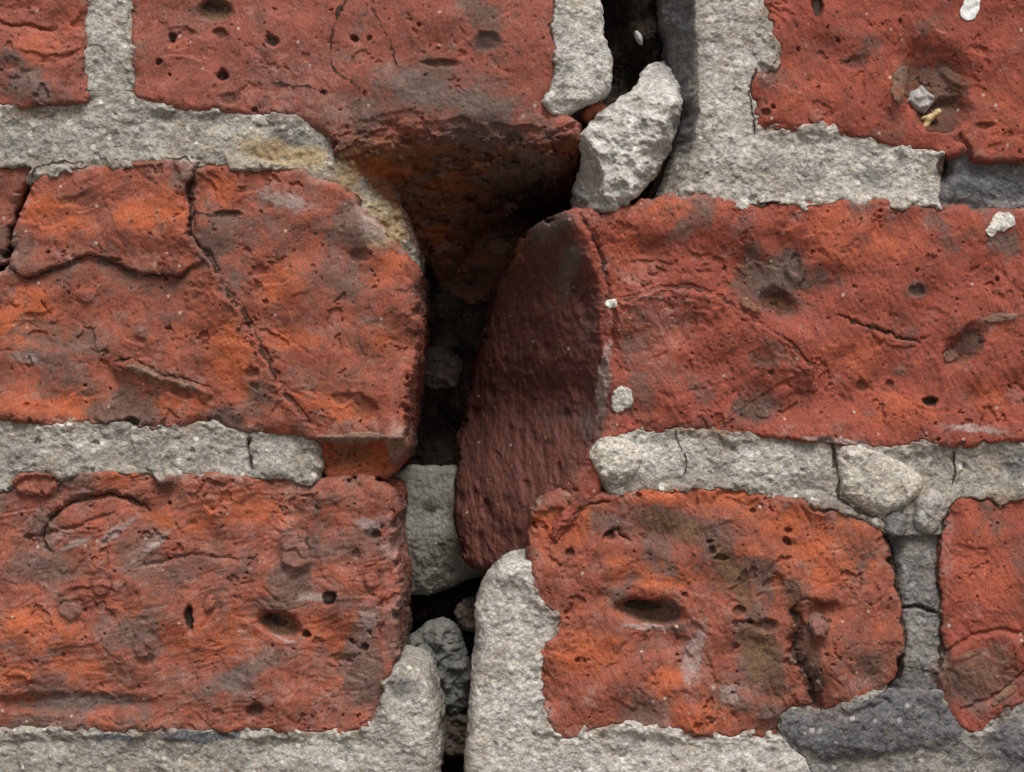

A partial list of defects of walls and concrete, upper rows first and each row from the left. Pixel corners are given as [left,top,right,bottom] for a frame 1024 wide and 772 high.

crack [600,0,663,107]
peeling [581,102,607,124]
crack [748,67,757,134]
crack [5,155,308,421]
crack [563,165,818,390]
crack [399,269,492,471]
crack [675,430,688,475]
crack [44,492,152,555]
crack [410,576,482,660]
crack [790,437,957,715]
crack [441,756,464,772]